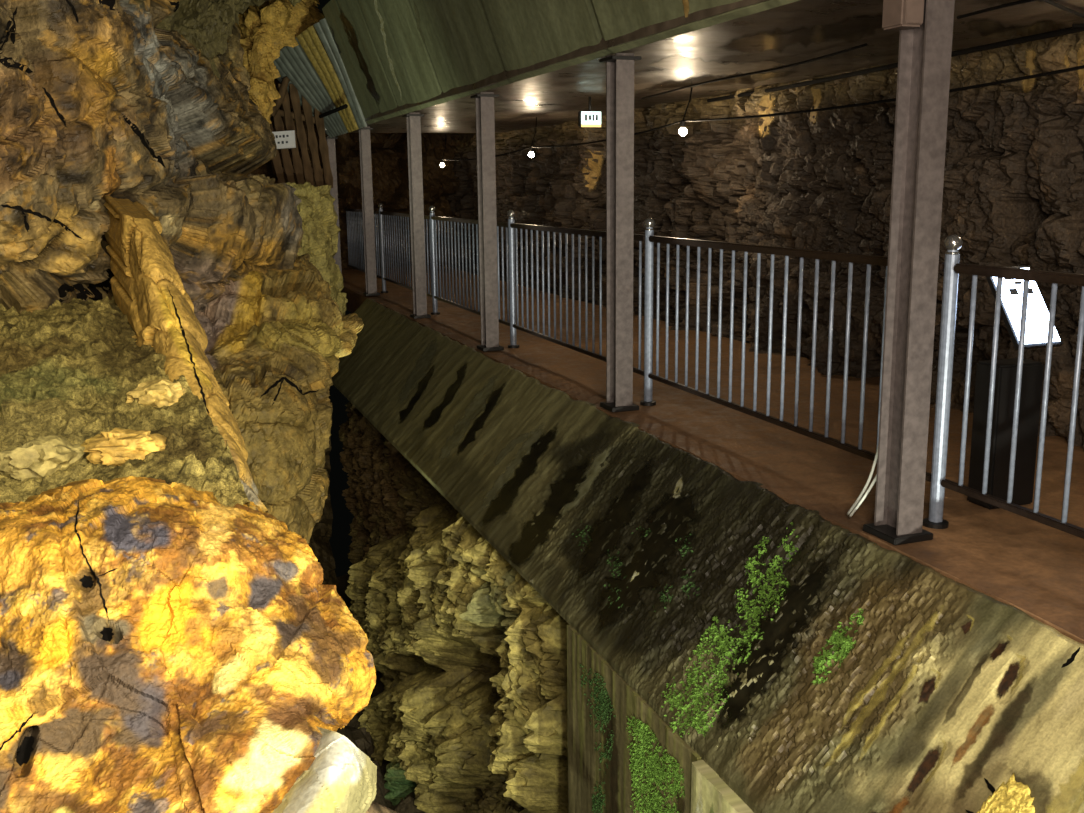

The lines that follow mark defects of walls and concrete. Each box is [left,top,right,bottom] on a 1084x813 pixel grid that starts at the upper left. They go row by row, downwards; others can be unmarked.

leakage [717,553,832,728]
leakage [603,707,619,813]